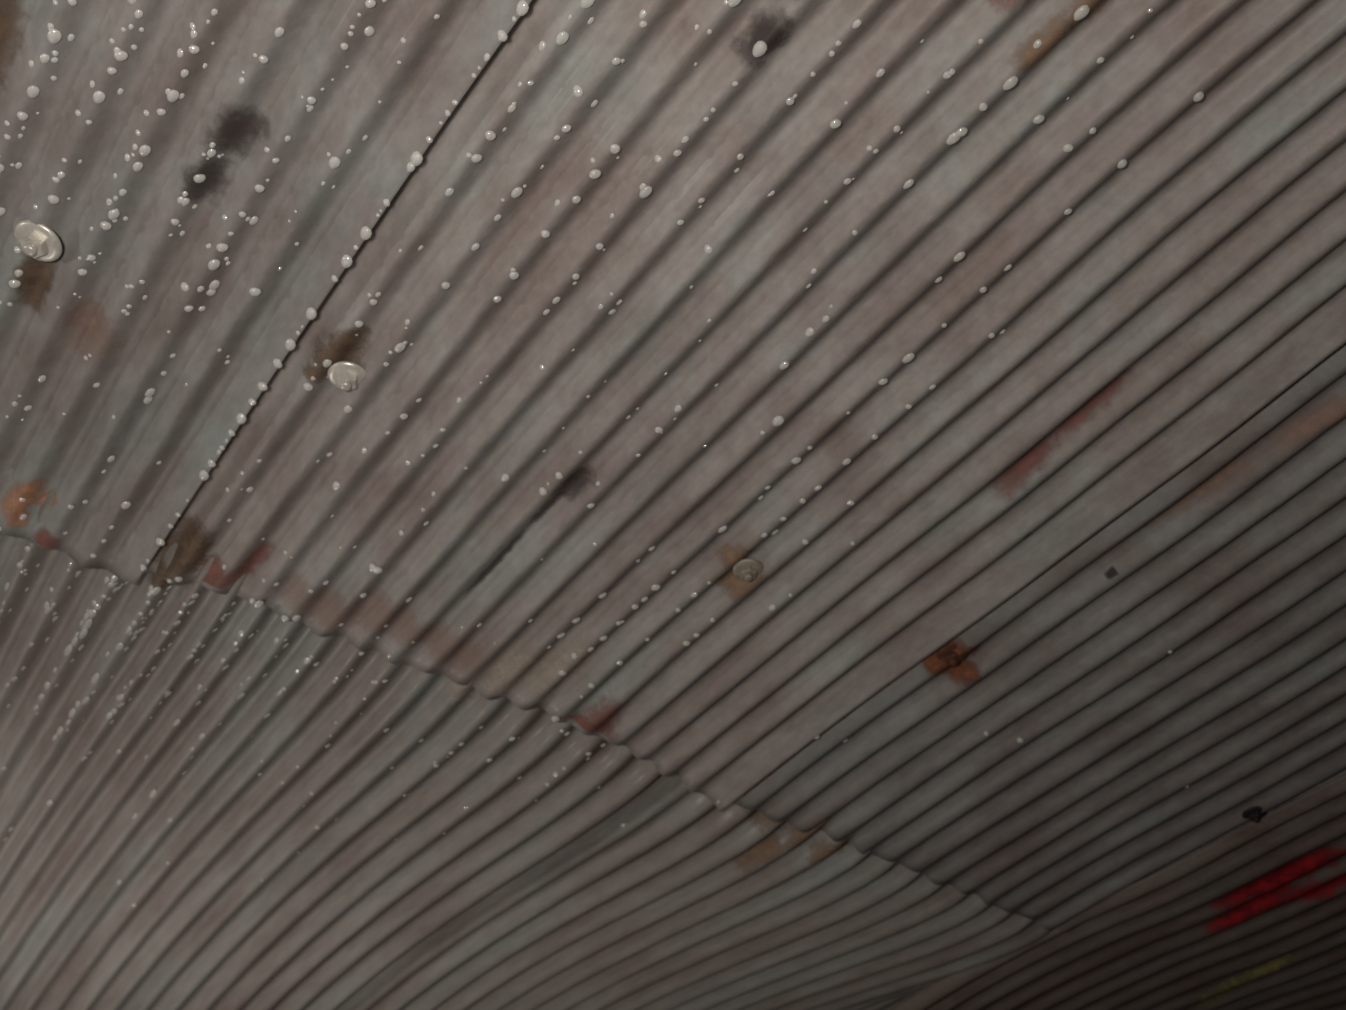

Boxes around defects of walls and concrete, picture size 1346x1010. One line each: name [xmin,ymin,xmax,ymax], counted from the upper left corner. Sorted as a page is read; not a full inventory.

corrosion [5,481,54,526]
corrosion [924,639,978,682]
corrosion [567,706,618,732]